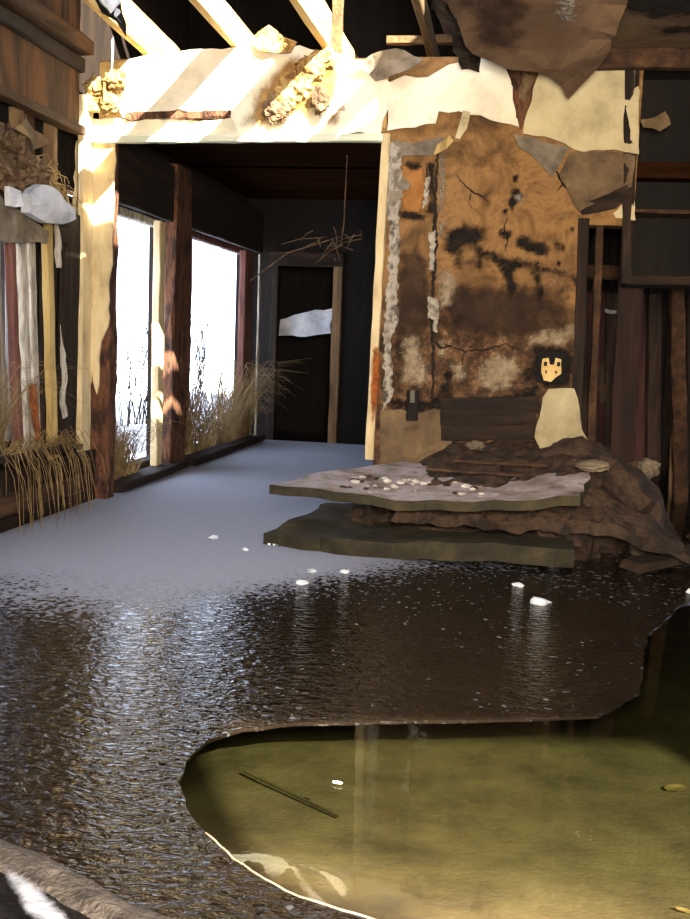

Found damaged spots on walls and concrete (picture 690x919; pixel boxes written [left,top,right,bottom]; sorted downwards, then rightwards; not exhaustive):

spalling [502,175,522,214]
peeling [506,68,635,220]
water stain [392,224,577,412]